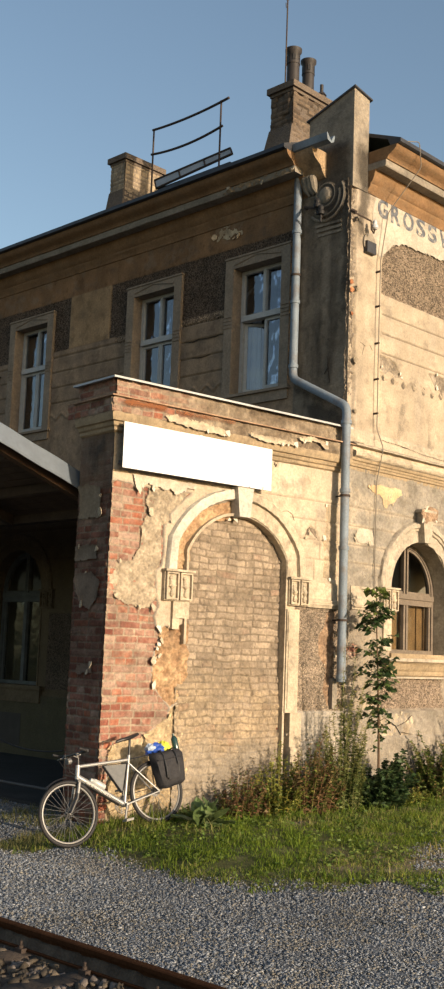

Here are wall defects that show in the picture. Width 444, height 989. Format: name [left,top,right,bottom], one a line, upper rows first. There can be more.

peeling [368,485,402,508]
spalling [177,501,238,570]
spalling [74,474,197,825]